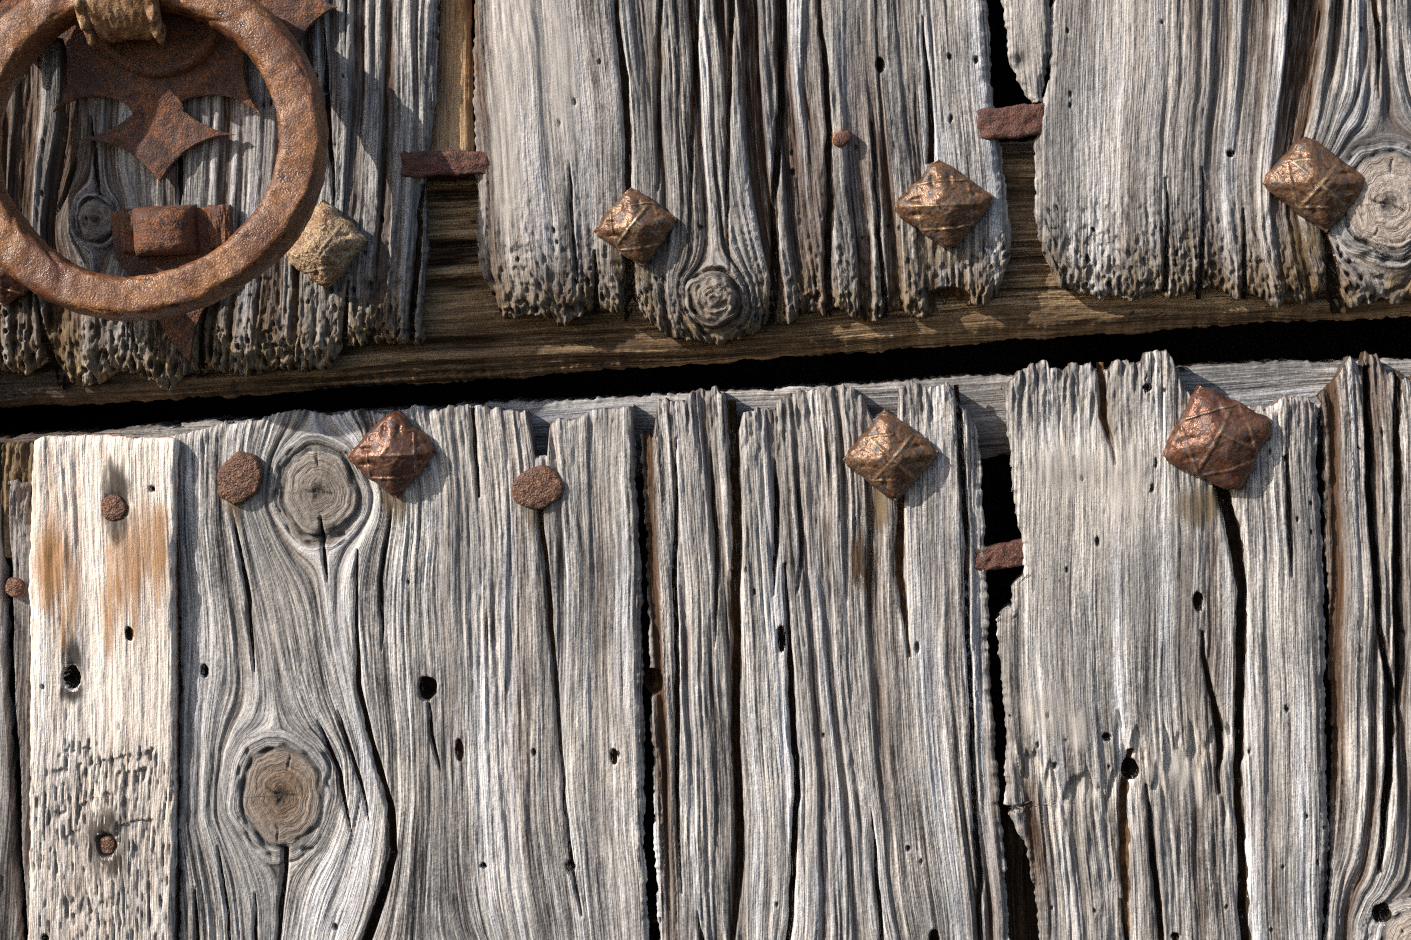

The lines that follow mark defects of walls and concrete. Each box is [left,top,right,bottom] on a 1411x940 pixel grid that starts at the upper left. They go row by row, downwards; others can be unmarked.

crack [1201,486,1252,940]